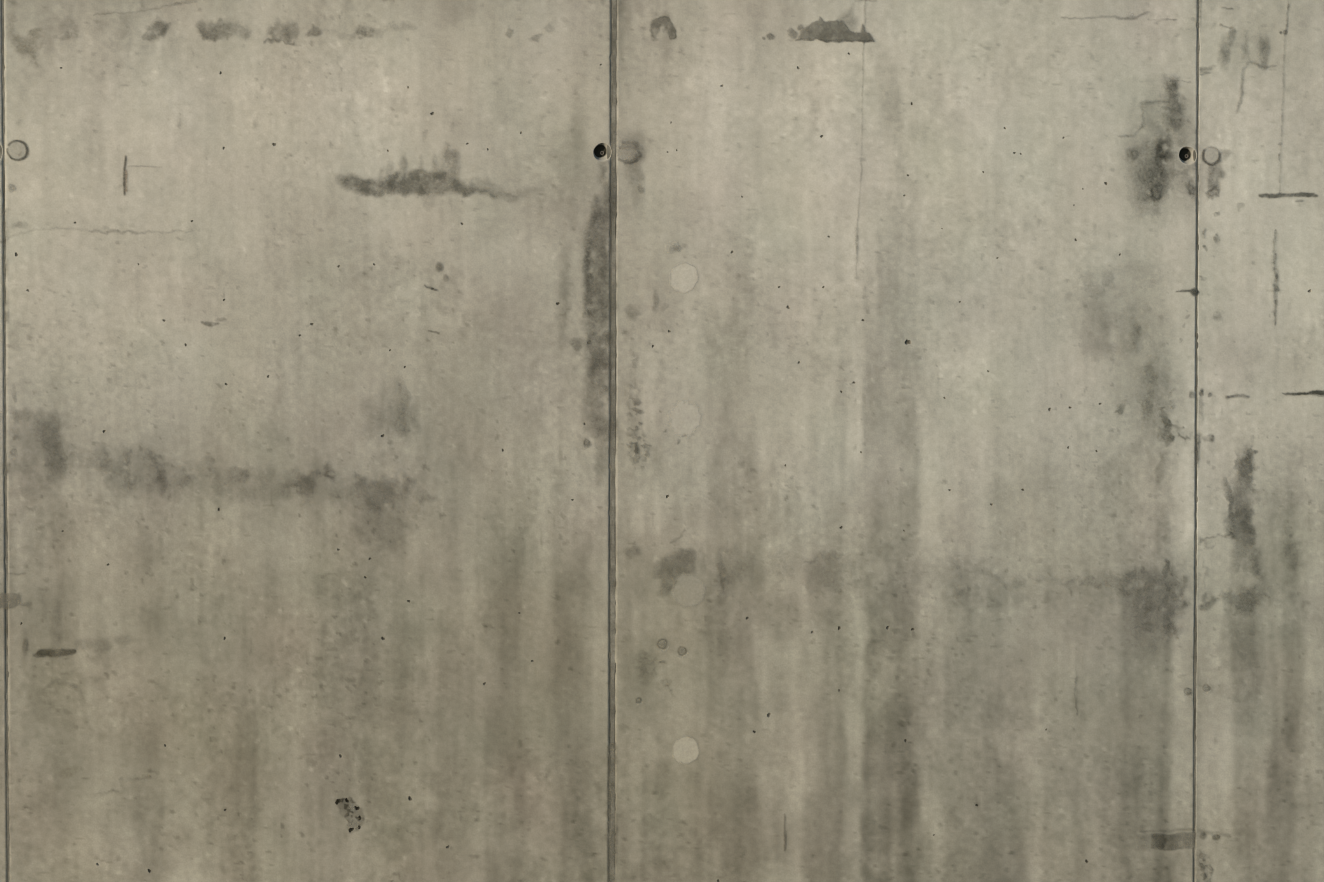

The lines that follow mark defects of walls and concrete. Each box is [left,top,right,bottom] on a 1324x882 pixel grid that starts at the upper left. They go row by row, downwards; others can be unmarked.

water stain [342,171,473,195]
water stain [586,205,610,430]
water stain [1228,496,1258,574]
spalling [335,798,361,832]